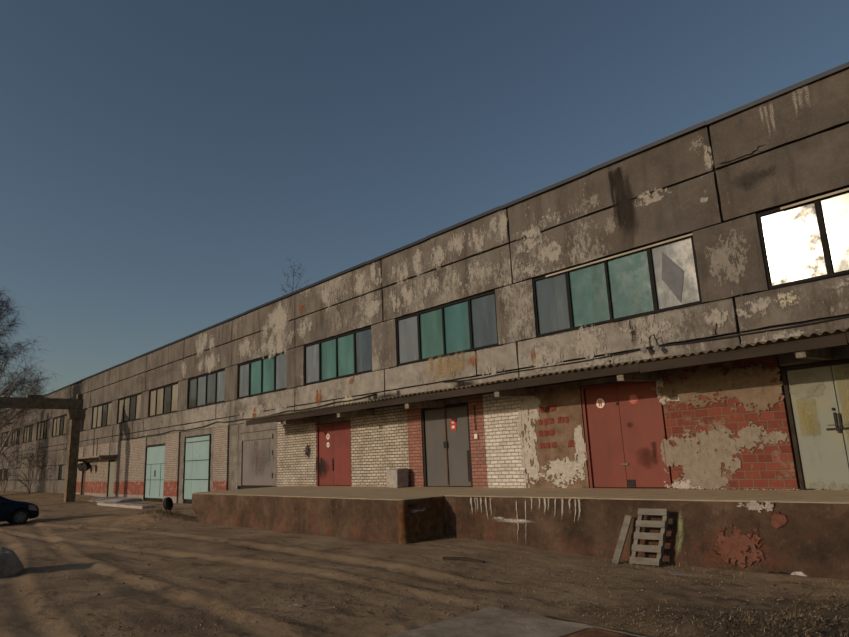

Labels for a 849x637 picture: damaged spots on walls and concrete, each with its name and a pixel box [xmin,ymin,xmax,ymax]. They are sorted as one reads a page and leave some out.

water stain [608,168,634,230]
peeling [701,221,798,328]
peeling [235,300,313,360]
peeling [517,393,588,488]
flaking render [650,363,825,489]
water stain [470,498,581,528]
peeling [737,499,788,529]
peeling [715,524,765,568]